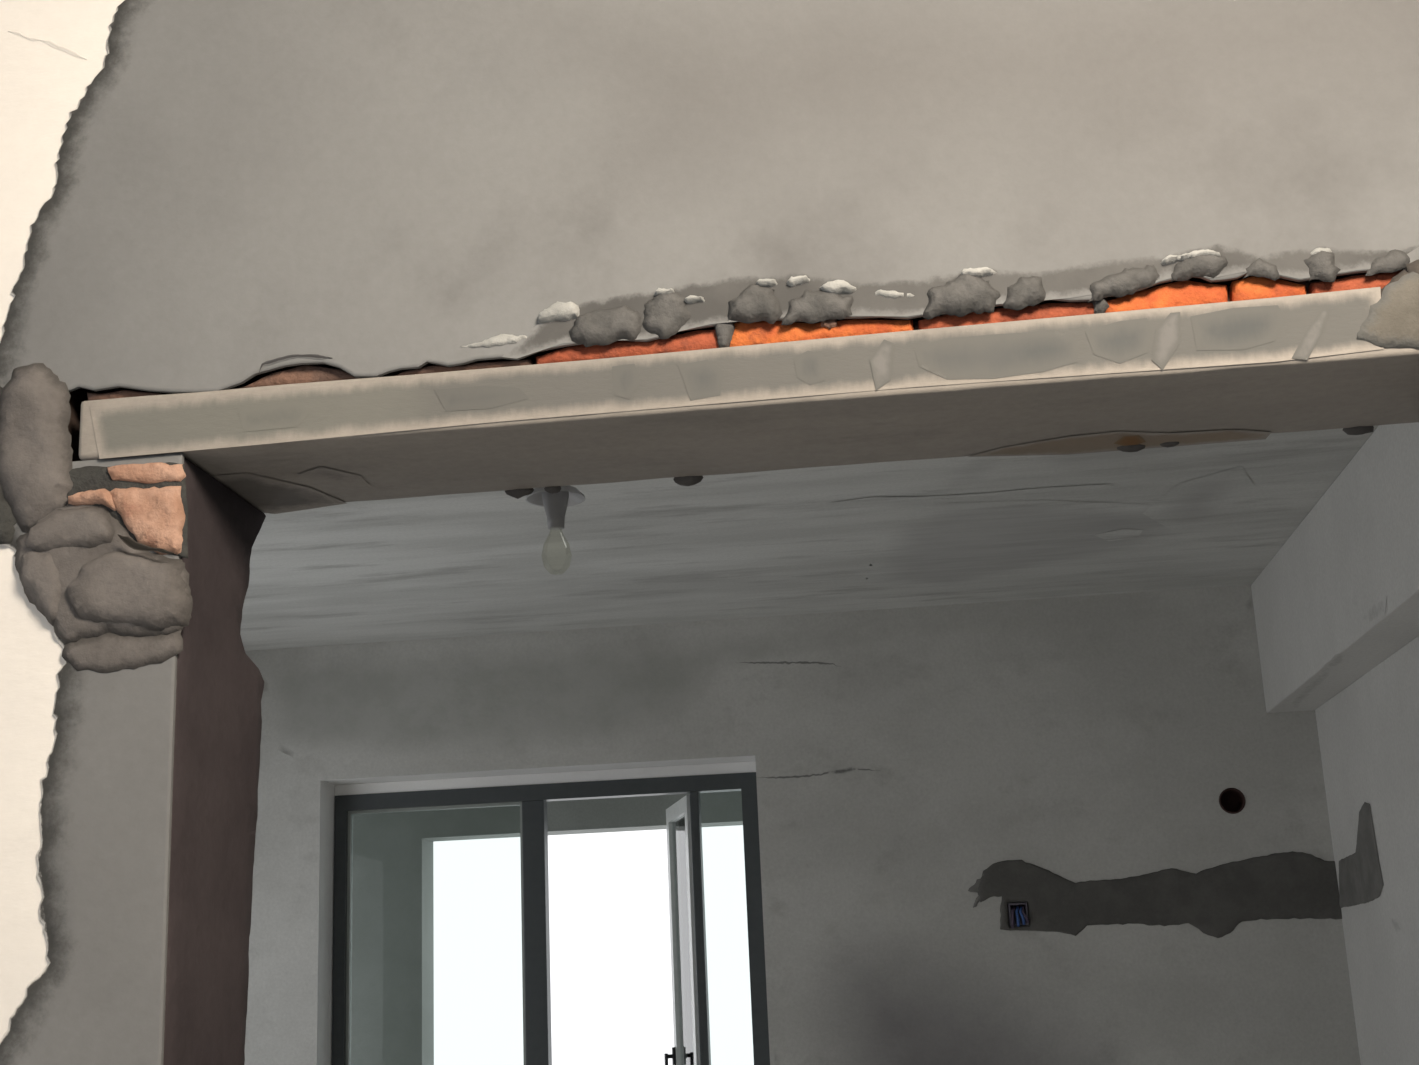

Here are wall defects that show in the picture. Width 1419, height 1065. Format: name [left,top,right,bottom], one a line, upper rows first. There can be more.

spalling [396,242,1419,376]
spalling [87,390,165,401]
spalling [237,365,361,389]
flaking render [67,462,188,558]